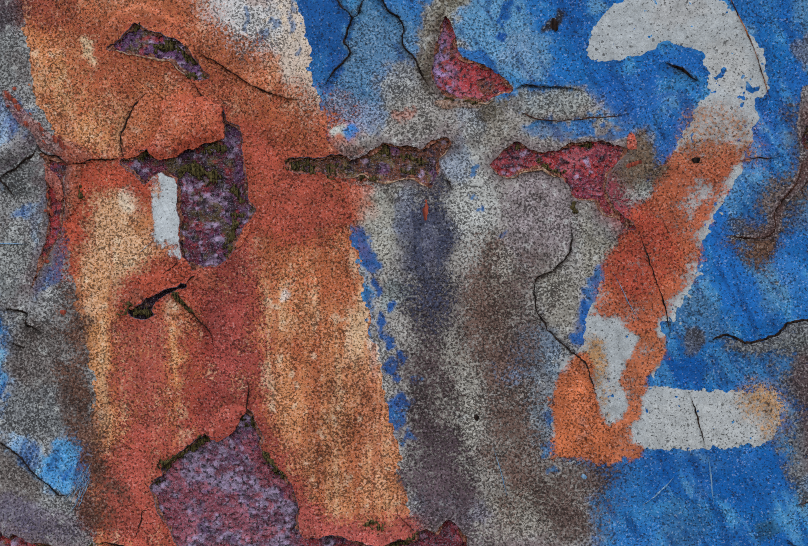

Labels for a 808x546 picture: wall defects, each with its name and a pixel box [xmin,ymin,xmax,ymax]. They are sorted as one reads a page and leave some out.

peeling [107,22,209,81]
crack [323,0,363,86]
crack [382,0,431,87]
peeling [431,16,513,109]
peeling [116,88,256,319]
peeling [285,137,451,188]
peeling [489,132,642,245]
crack [533,225,597,396]
crack [639,232,671,332]
peeling [713,319,808,508]
peeling [150,404,368,546]
peeling [379,520,467,546]